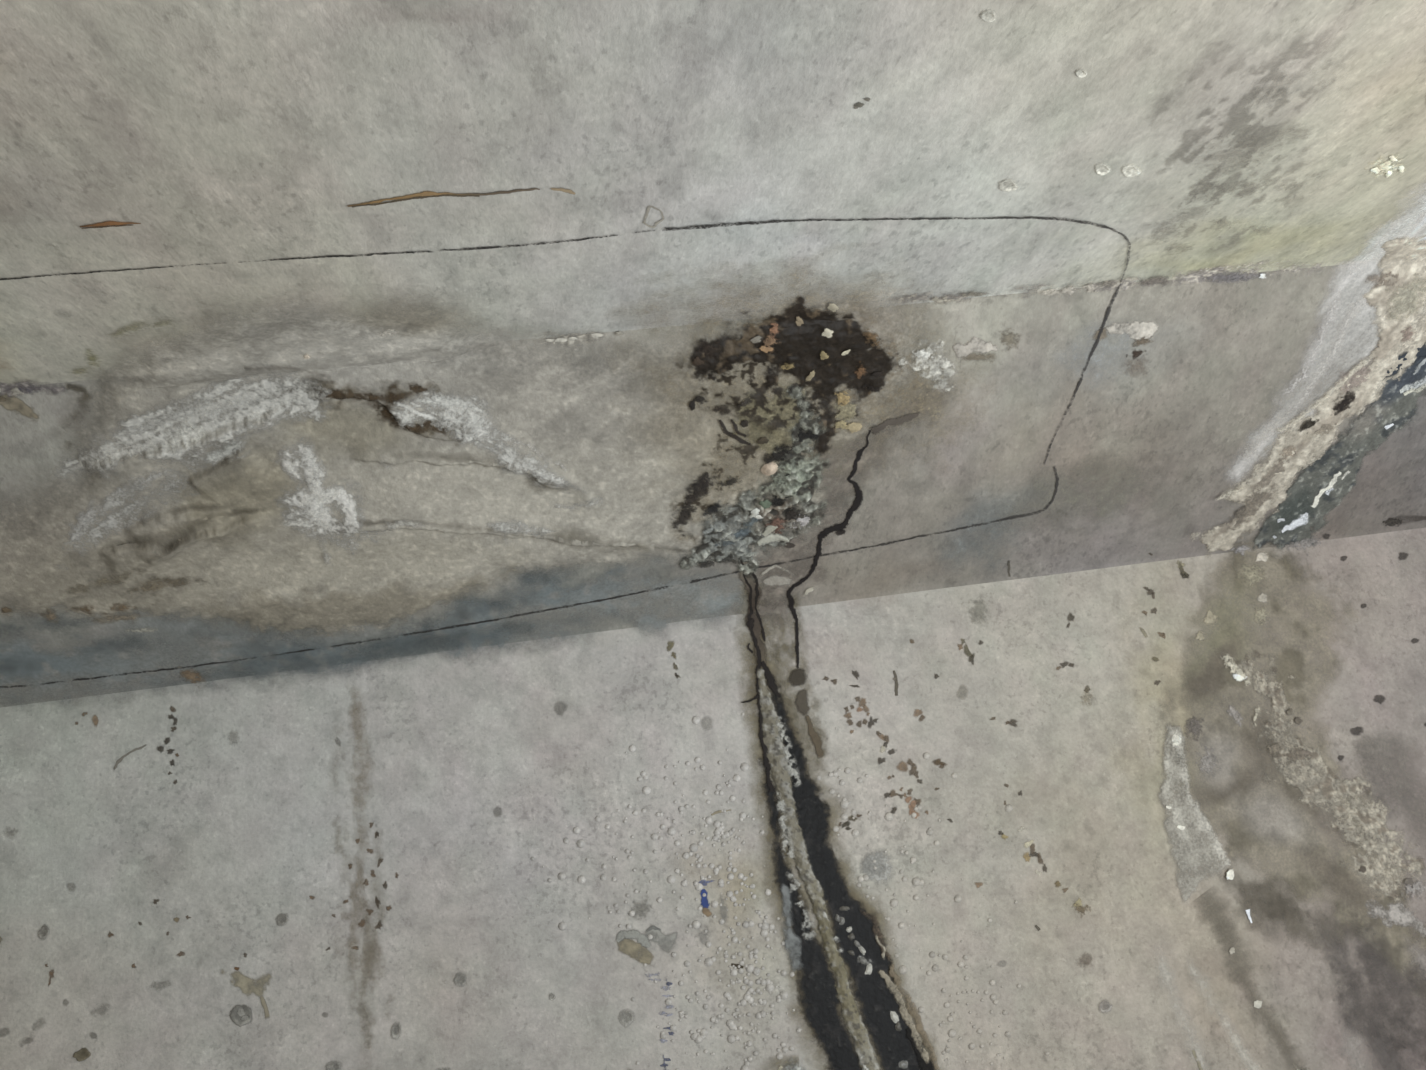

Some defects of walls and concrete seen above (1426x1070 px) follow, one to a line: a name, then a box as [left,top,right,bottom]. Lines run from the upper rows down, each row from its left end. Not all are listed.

corrosion [80,221,141,229]
corrosion [348,188,576,208]
damp [58,373,570,562]
spalling [673,386,830,578]
damp [757,339,956,624]
peeling [1273,471,1350,539]
peeling [1400,358,1426,396]
damp [0,568,740,703]
crack [711,412,940,1070]
damp [1172,536,1426,1070]